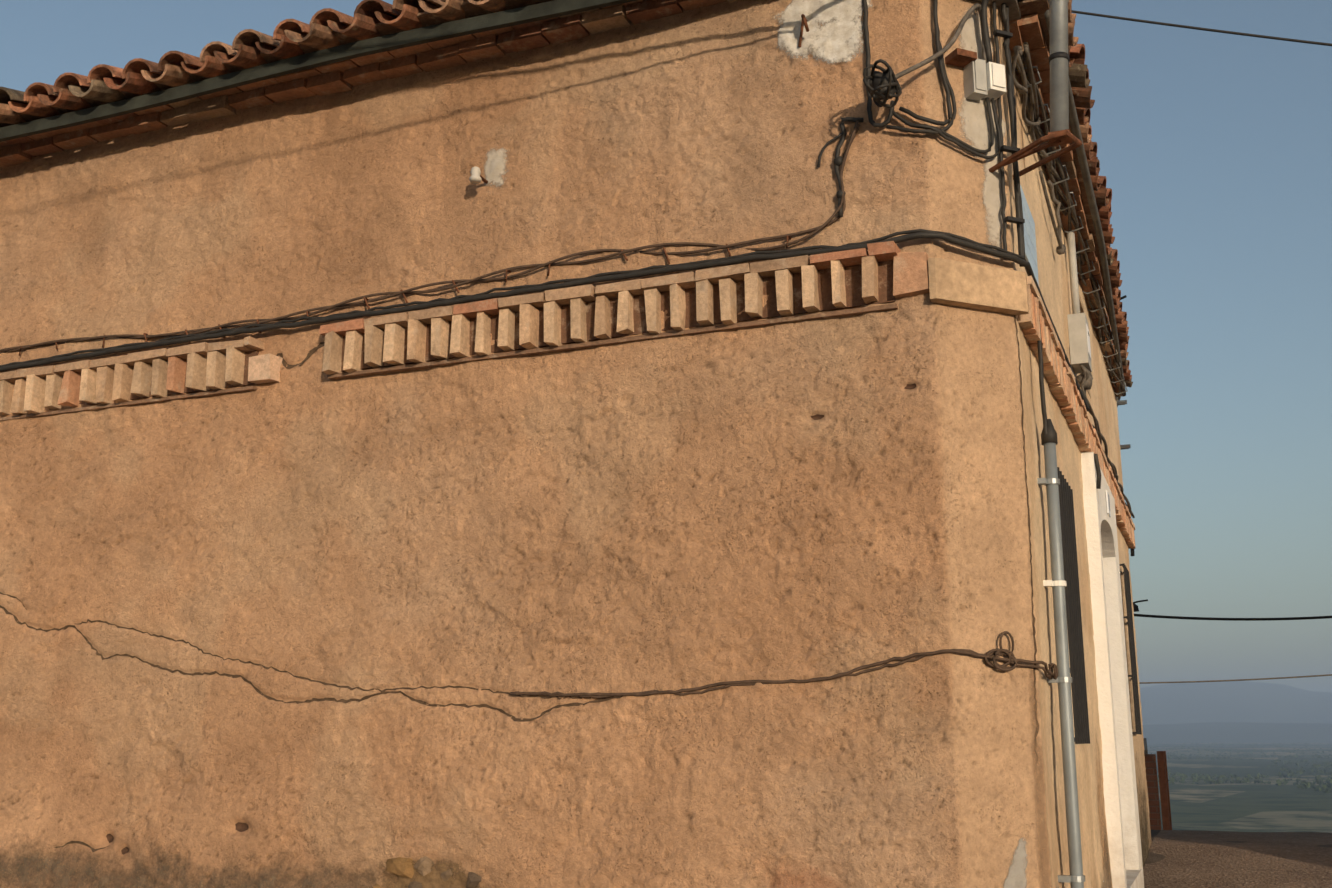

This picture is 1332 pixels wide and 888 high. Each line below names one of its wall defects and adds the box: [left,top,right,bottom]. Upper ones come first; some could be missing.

crack [0,592,623,722]
flaking render [373,856,482,888]